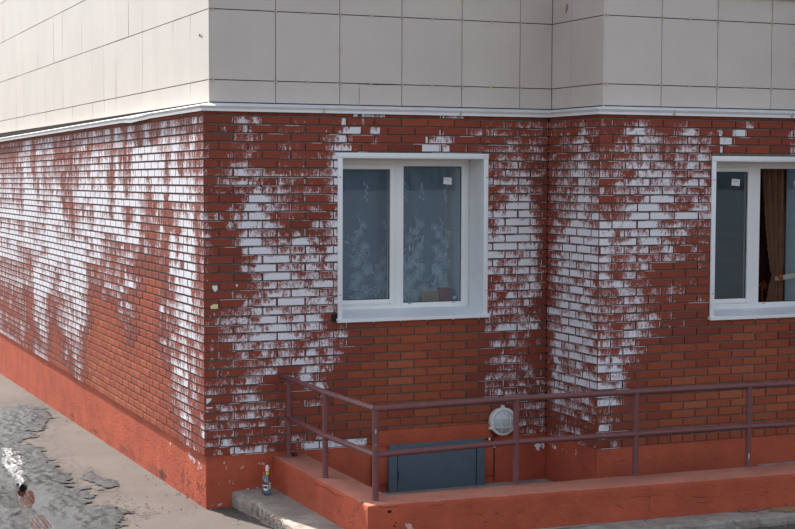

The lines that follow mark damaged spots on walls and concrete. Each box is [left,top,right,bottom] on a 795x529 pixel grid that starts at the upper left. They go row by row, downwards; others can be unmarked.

leakage [0,114,795,467]